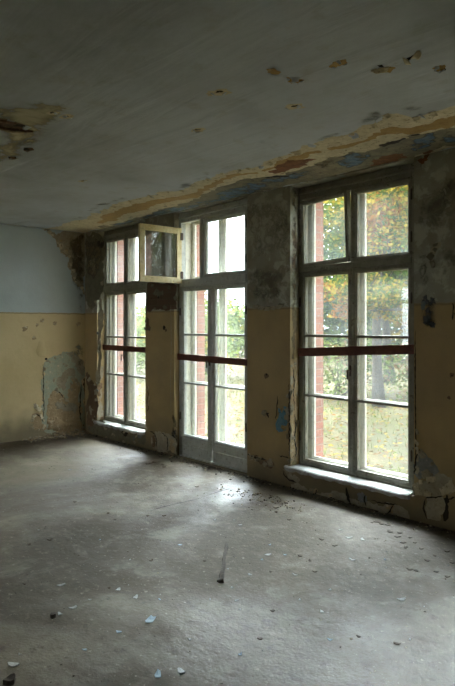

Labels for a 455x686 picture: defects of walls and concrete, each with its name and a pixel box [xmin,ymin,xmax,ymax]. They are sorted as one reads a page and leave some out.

leakage [0,104,62,158]
peeling [42,106,455,310]
flaking render [144,282,178,332]
peeling [30,351,177,455]
flaking render [248,356,299,469]
flaking render [412,449,455,521]
crack [443,495,455,521]